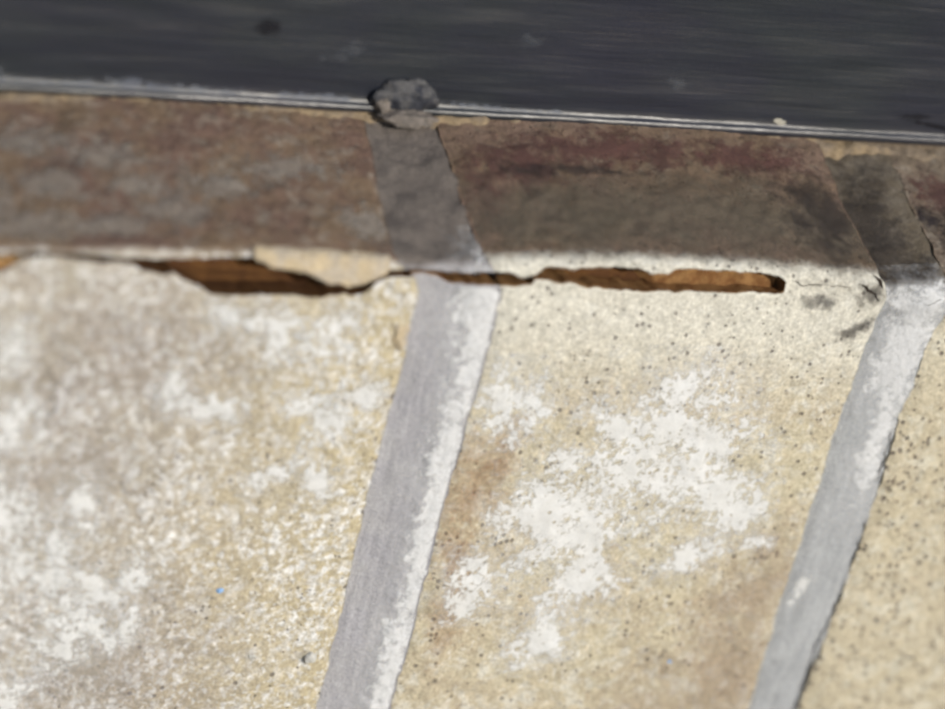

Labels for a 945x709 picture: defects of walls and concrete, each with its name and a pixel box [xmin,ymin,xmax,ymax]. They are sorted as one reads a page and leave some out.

crack [36,253,132,262]
crack [165,257,318,282]
crack [632,268,883,336]